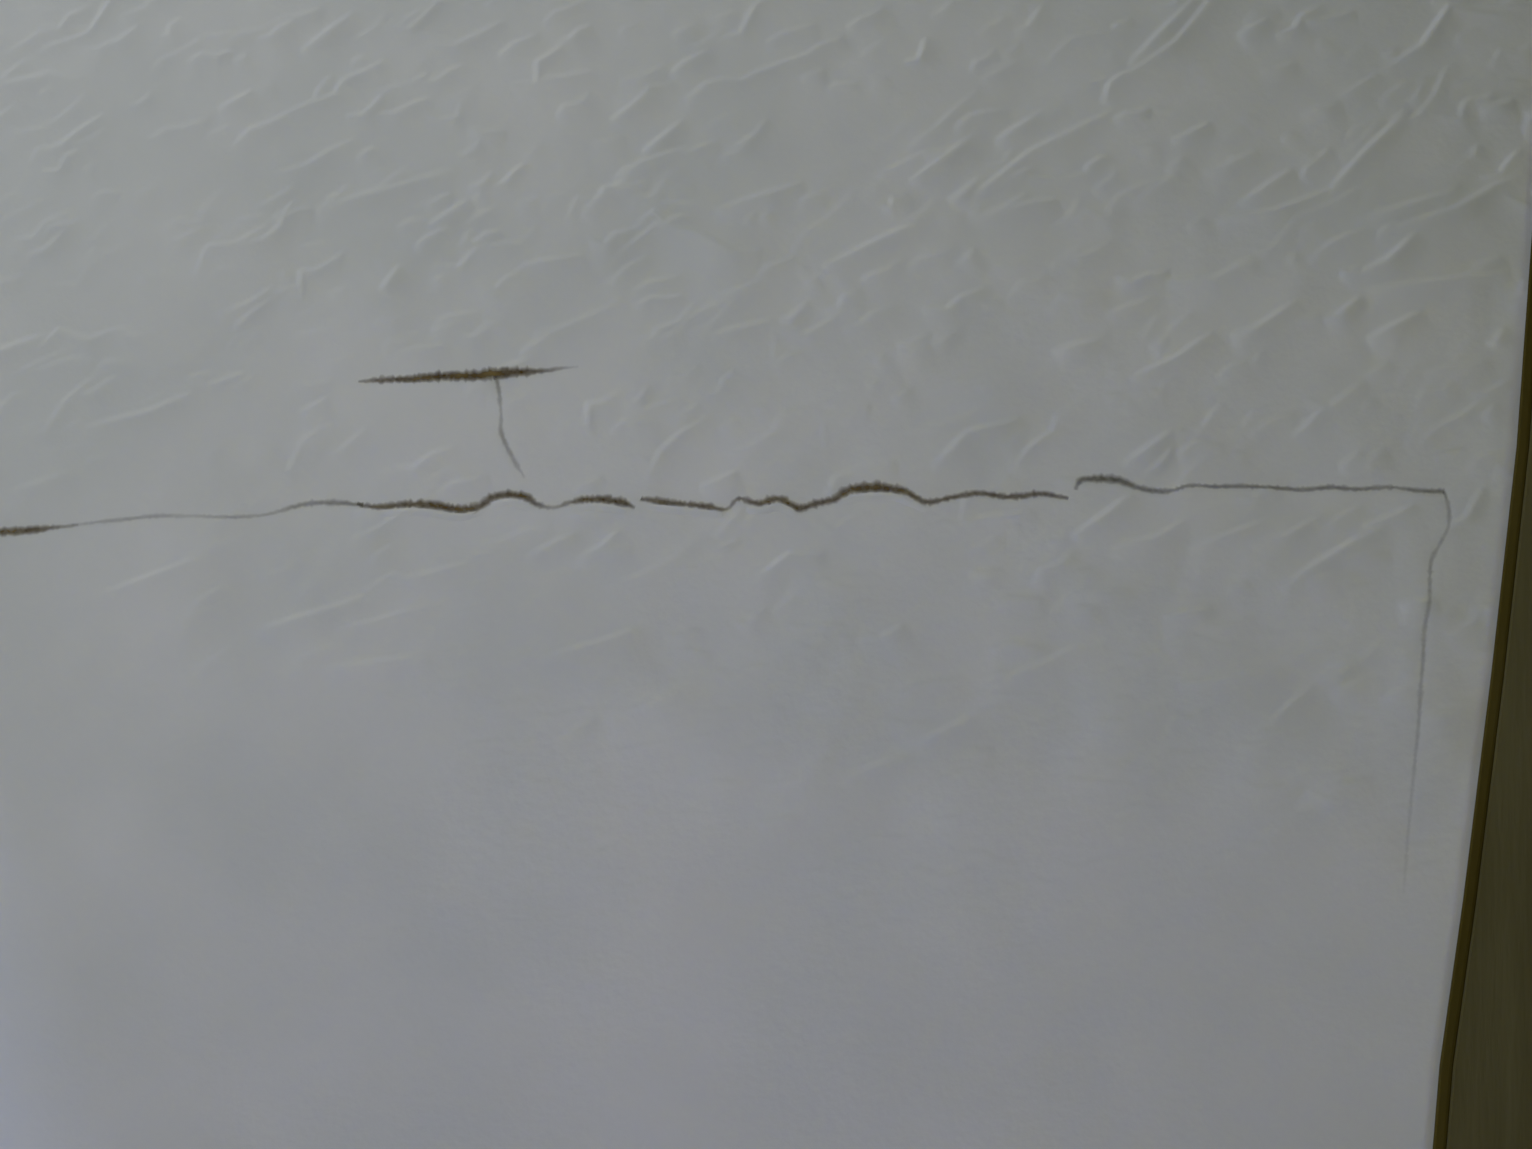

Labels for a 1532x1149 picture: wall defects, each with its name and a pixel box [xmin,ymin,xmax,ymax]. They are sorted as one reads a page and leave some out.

crack [375,368,543,382]
crack [364,491,537,521]
crack [573,476,1150,518]
crack [0,527,52,535]